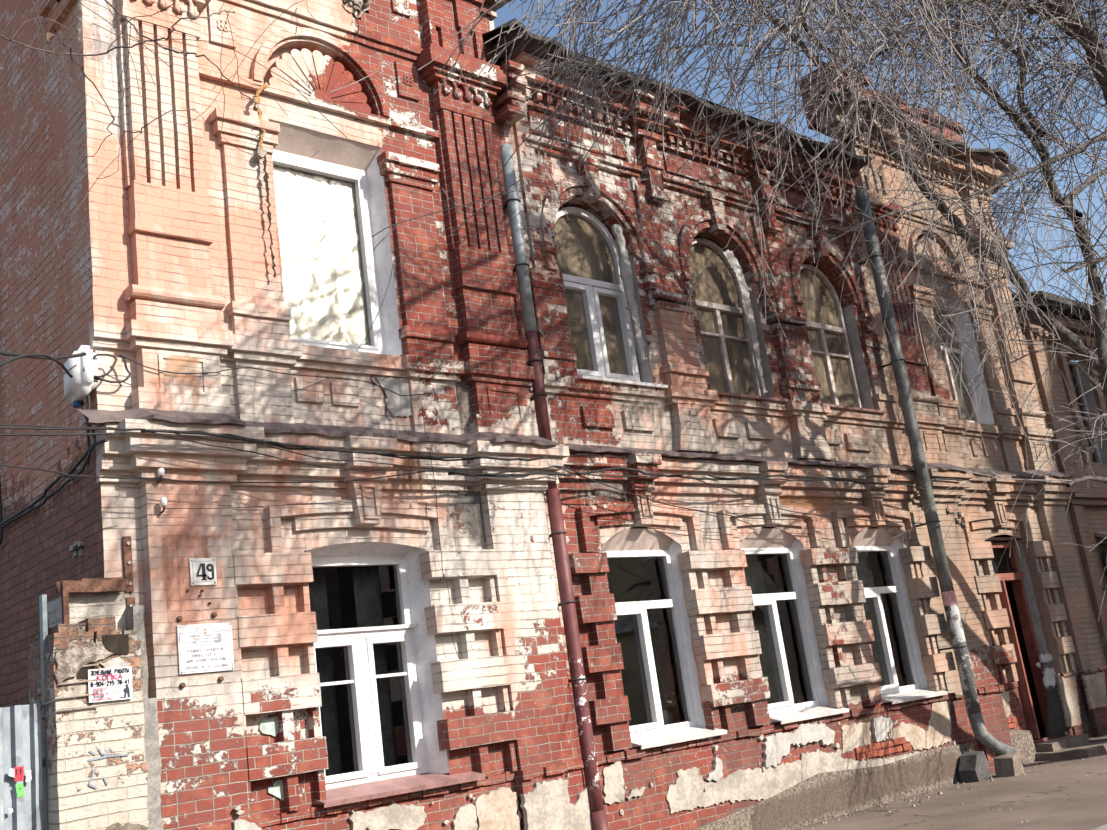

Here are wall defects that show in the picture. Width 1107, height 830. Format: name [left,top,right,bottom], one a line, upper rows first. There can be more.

spalling [52,642,131,684]
peeling [258,716,279,737]
spalling [854,737,914,761]
peeling [267,780,284,801]